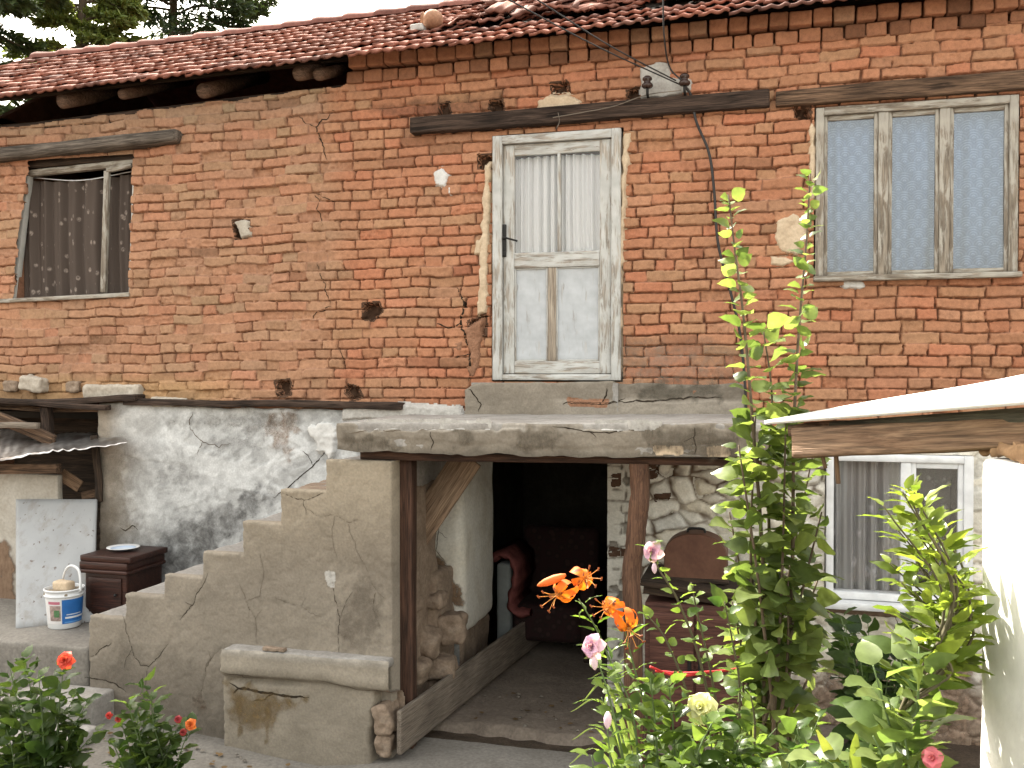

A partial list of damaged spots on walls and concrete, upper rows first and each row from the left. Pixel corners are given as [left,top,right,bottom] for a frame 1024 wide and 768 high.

crack [298,110,334,159]
spalling [361,301,384,322]
crack [437,288,482,412]
spalling [273,378,294,398]
spalling [344,383,365,402]
crack [553,390,720,437]
peeling [0,540,16,599]
crack [240,451,384,652]
crack [85,617,168,693]
crack [201,650,377,701]